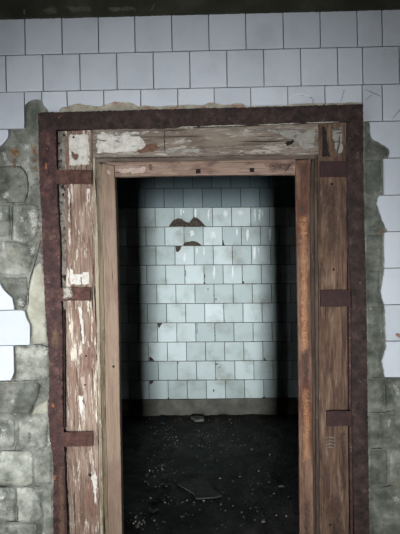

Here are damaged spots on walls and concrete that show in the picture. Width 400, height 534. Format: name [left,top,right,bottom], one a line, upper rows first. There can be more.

spalling [60,101,362,112]
peeling [69,131,149,166]
spalling [169,216,205,227]
spalling [0,100,54,534]
spalling [363,122,400,534]
peeling [78,376,88,420]